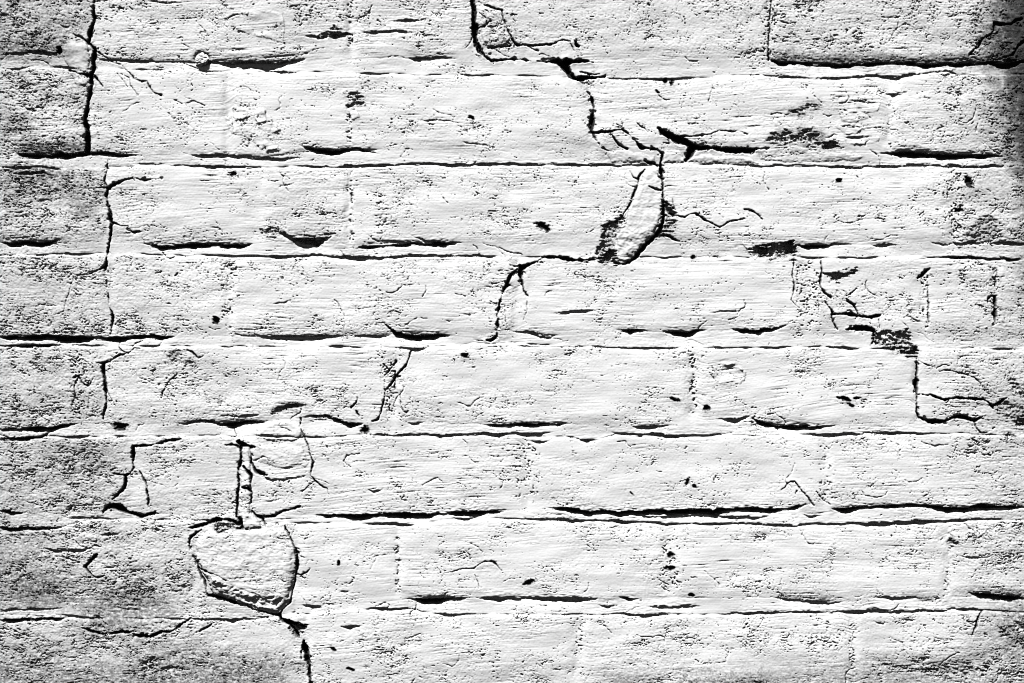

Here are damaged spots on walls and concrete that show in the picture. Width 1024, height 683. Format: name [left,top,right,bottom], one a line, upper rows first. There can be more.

crack [969,19,1024,56]
crack [69,0,102,154]
crack [470,0,768,342]
crack [90,177,148,274]
crack [792,263,880,336]
crack [987,275,997,322]
crack [74,348,125,419]
crack [351,351,412,422]
crack [913,362,1006,433]
crack [103,439,180,518]
crack [189,440,313,683]